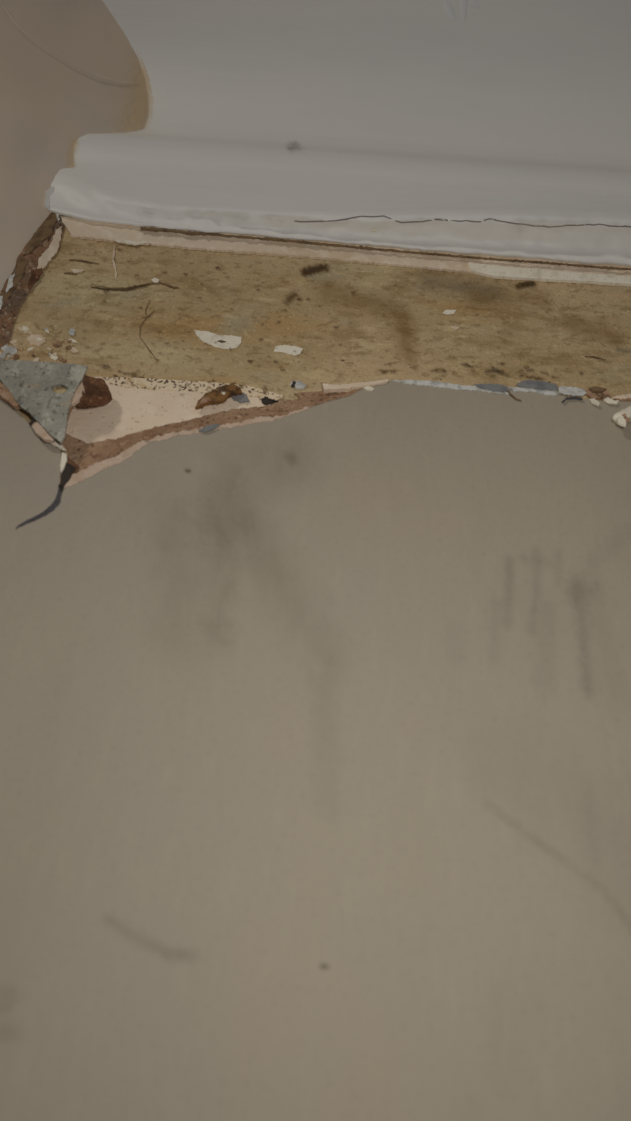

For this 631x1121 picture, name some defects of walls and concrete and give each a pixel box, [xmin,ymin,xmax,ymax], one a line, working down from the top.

flaking render [0,186,631,488]